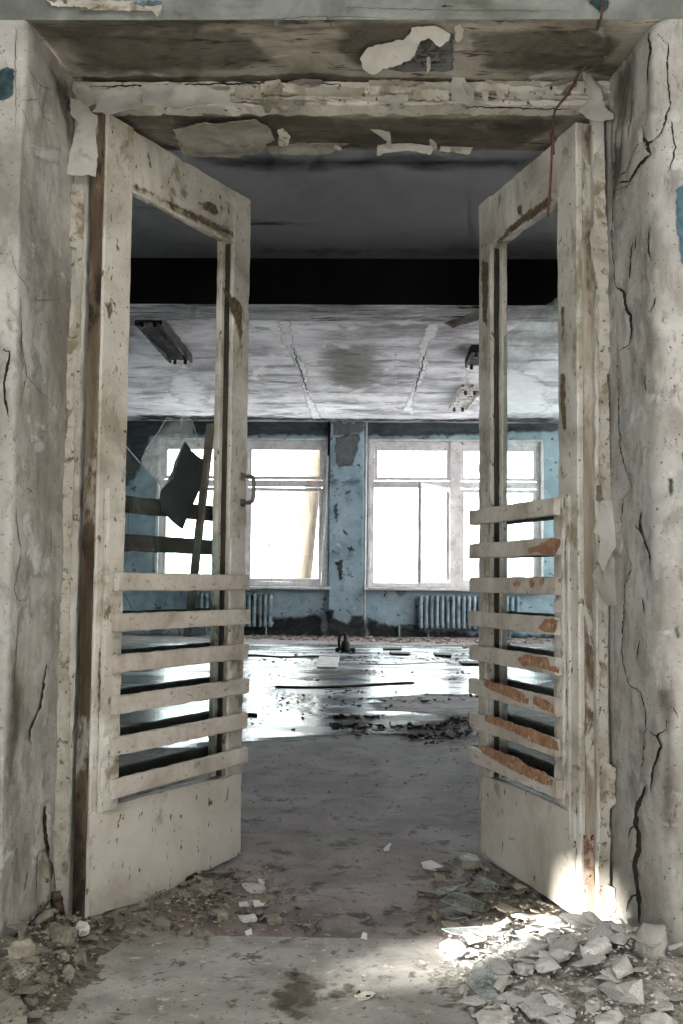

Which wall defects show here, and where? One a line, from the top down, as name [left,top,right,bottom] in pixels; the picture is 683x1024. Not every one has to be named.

flaking render [67,24,614,177]
crack [619,33,677,177]
crack [614,227,656,351]
crack [290,344,308,394]
leakage [325,345,376,389]
crack [414,349,427,394]
flaking render [332,421,364,467]
crack [29,664,47,745]
crack [626,706,678,923]
crack [24,849,47,900]